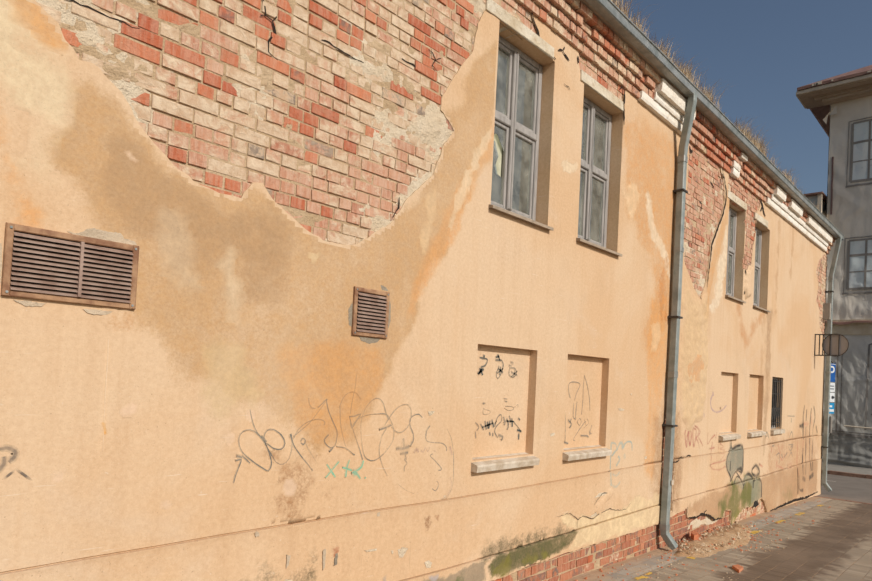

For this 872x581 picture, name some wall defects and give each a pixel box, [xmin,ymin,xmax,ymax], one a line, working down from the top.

crack [71,0,140,29]
crack [261,0,278,60]
spalling [36,0,538,245]
spalling [13,299,46,307]
damp [0,0,497,527]
crack [699,168,727,286]
spalling [683,143,760,298]
damp [735,215,822,497]
damp [237,538,320,581]
damp [476,519,576,565]
spalling [421,457,818,581]